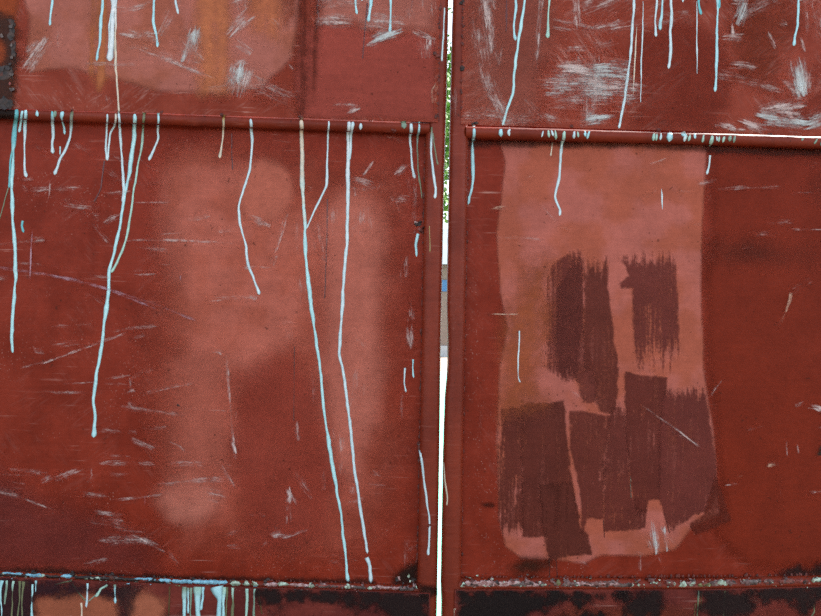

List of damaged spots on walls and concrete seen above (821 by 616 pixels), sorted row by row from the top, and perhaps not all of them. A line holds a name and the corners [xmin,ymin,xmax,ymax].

rust [0,13,18,110]